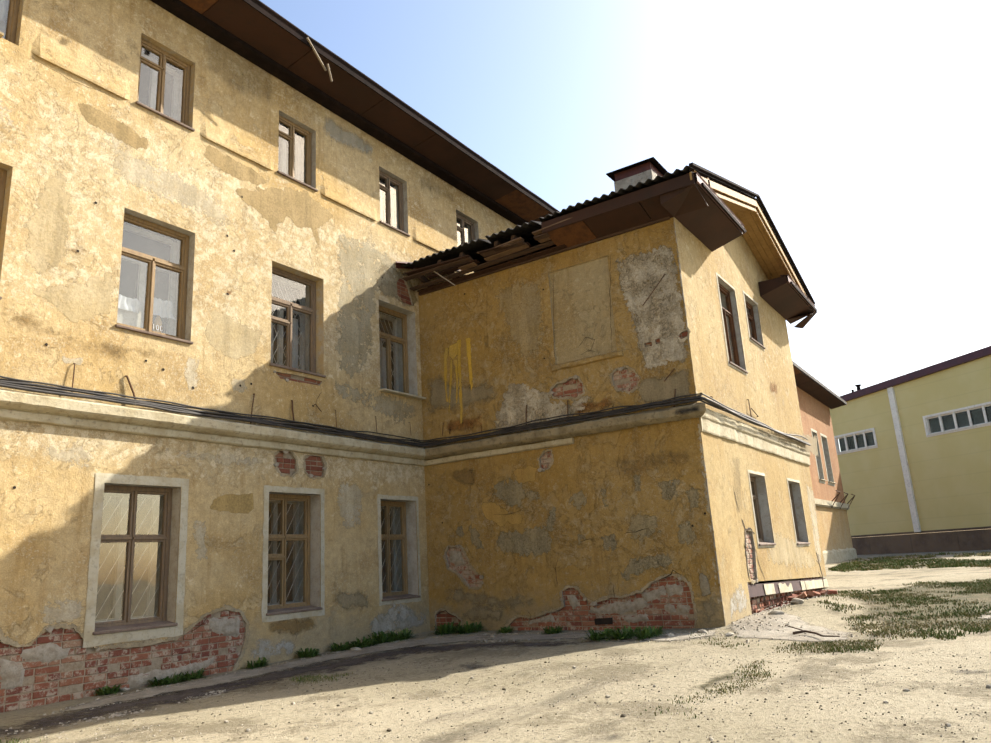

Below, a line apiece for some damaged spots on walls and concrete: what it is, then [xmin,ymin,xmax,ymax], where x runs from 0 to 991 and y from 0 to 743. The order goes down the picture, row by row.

peeling [608,245,691,395]
peeling [494,375,590,433]
spalling [273,450,327,480]
spalling [443,526,483,590]
spalling [504,553,698,631]
spalling [0,597,250,713]